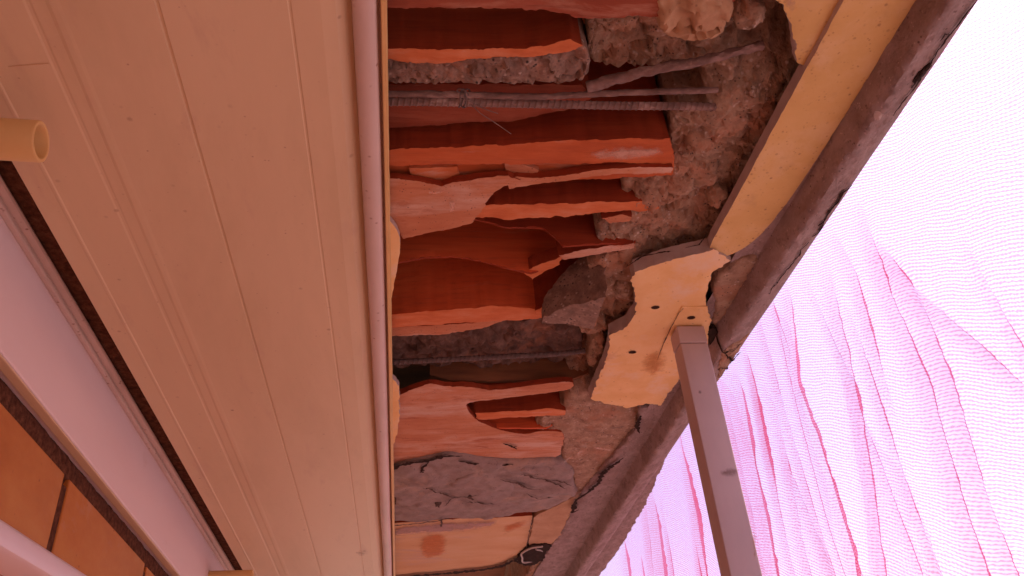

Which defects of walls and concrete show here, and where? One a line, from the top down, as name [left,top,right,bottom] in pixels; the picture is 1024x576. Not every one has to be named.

spalling [388,0,799,576]
crack [634,415,642,433]
crack [394,443,623,576]